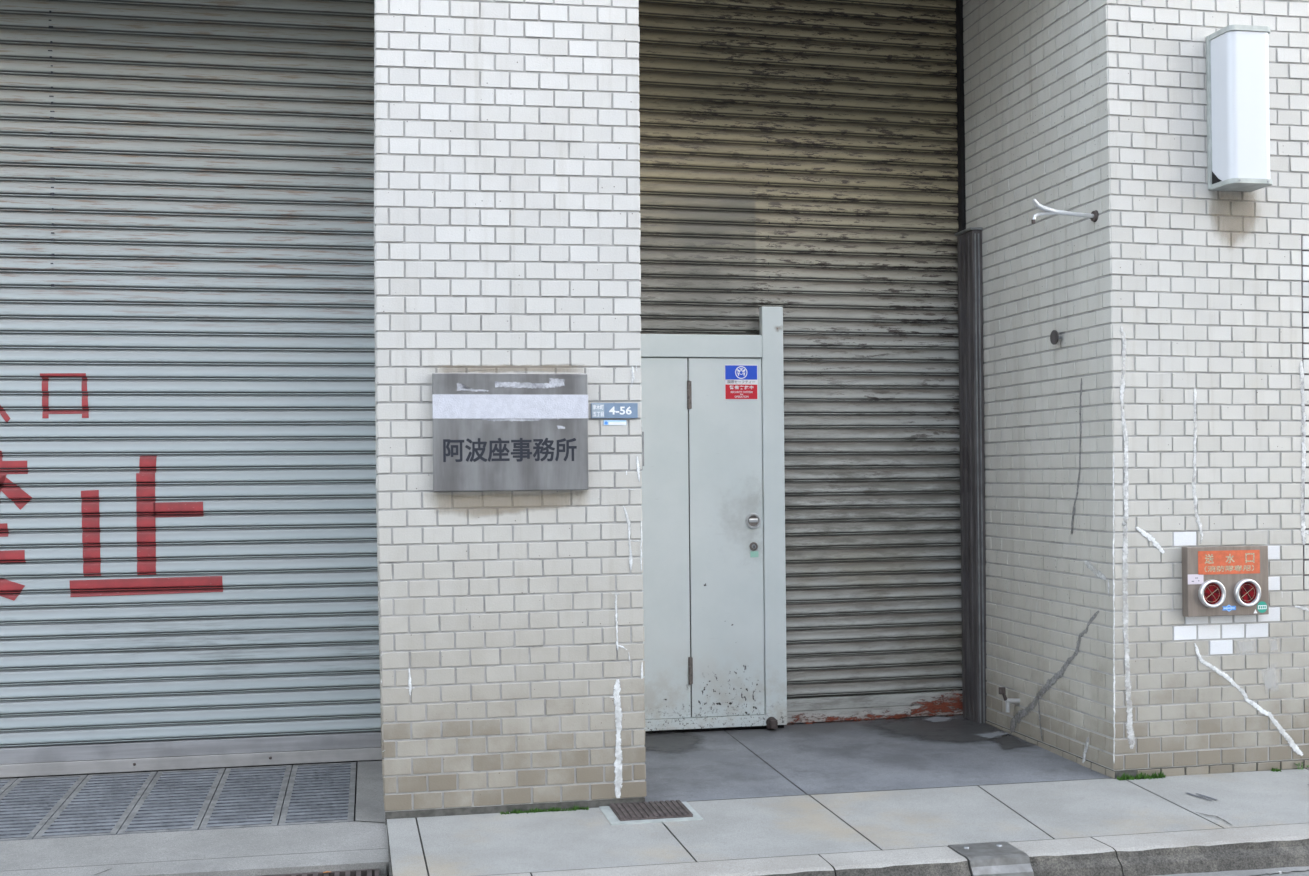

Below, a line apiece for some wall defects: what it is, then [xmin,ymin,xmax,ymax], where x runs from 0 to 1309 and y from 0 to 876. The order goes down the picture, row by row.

crack [610,456,643,798]
crack [1010,326,1165,763]
crack [1192,388,1203,543]
crack [1194,643,1303,756]
crack [1299,361,1309,550]